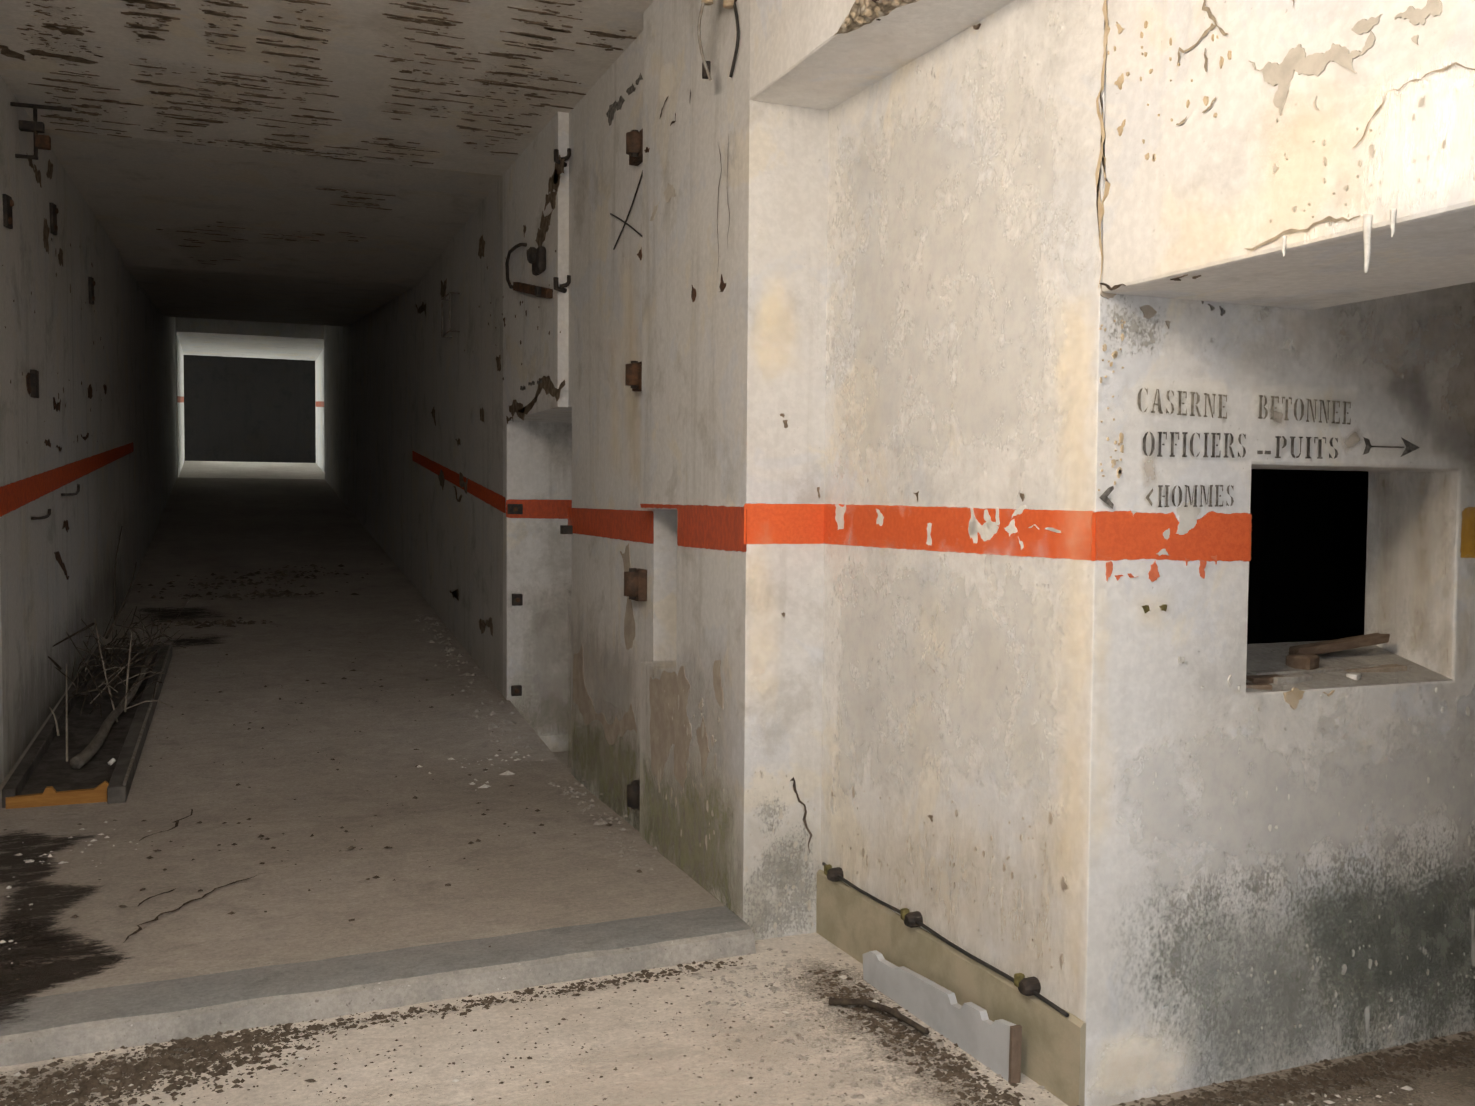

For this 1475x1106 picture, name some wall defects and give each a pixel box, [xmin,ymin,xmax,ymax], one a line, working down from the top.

spalling [834,0,918,35]
crack [1095,0,1126,291]
crack [1176,0,1228,125]
peeling [1249,0,1443,122]
crack [1353,62,1475,148]
spalling [523,155,564,253]
crack [1244,215,1361,251]
peeling [968,493,1061,550]
peeling [1105,500,1217,582]
crack [790,777,812,853]
damp [0,830,126,1020]
damp [1158,818,1475,1072]